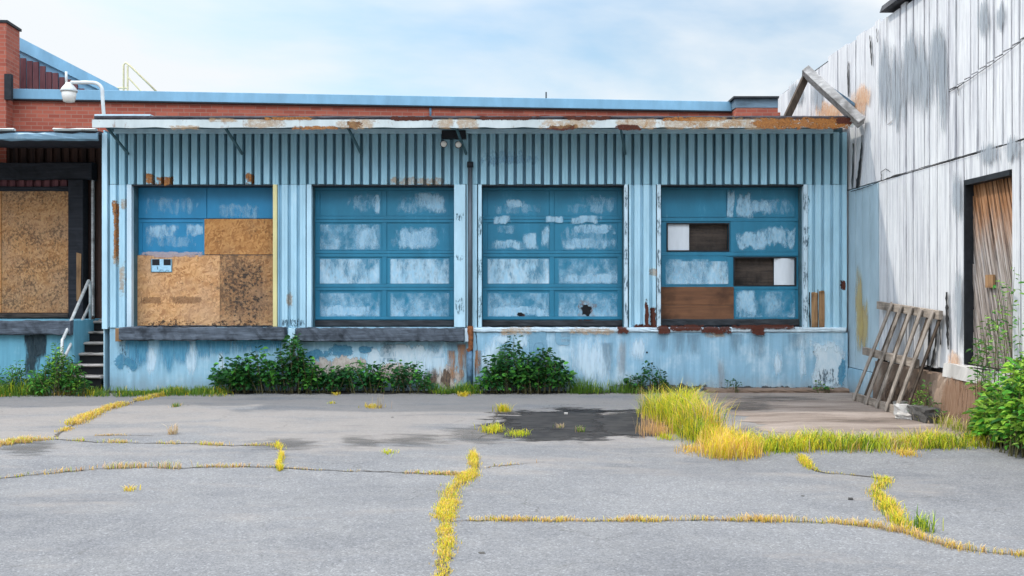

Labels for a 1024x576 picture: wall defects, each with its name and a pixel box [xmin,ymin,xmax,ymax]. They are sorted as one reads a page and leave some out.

damp [877,23,948,132]
rust [265,117,363,130]
rust [475,116,641,131]
rust [751,86,870,130]
peeling [477,200,522,237]
peeling [320,225,464,316]
peeling [476,216,629,322]
rust [617,299,657,334]
spalling [304,344,464,389]
peeling [810,341,846,387]
damp [479,407,672,441]
crack [3,435,555,576]